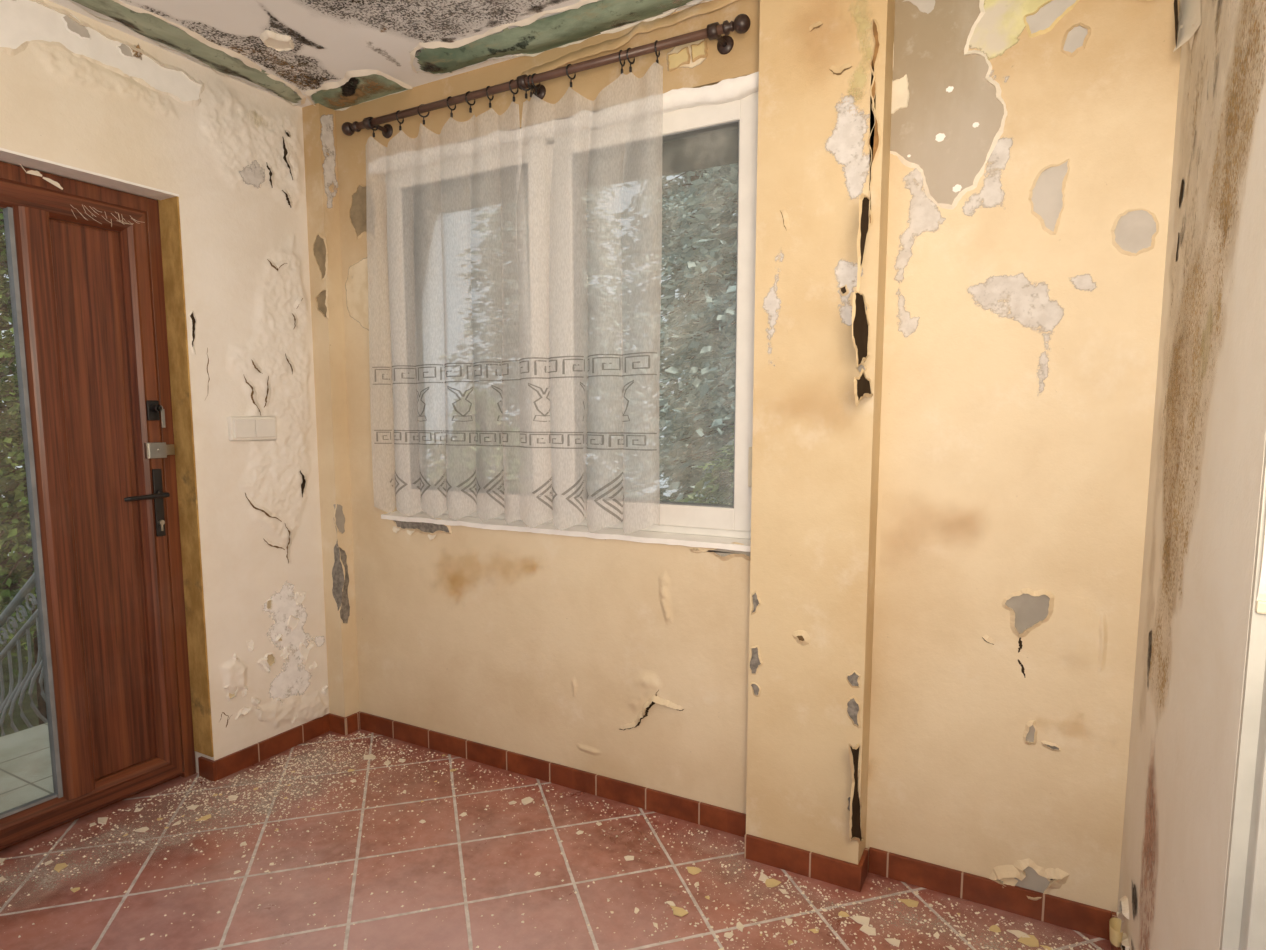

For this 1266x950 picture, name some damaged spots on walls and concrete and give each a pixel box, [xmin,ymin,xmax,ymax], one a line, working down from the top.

water stain [305,0,560,54]
peeling [825,95,870,199]
flaking render [890,0,1091,337]
peeling [1111,208,1159,256]
peeling [968,273,1064,392]
water stain [1147,0,1266,708]
spalling [332,503,350,624]
peeling [223,583,329,731]
crack [619,690,684,730]
peeling [1002,588,1055,678]
peeling [989,858,1070,900]
water stain [1131,766,1157,950]